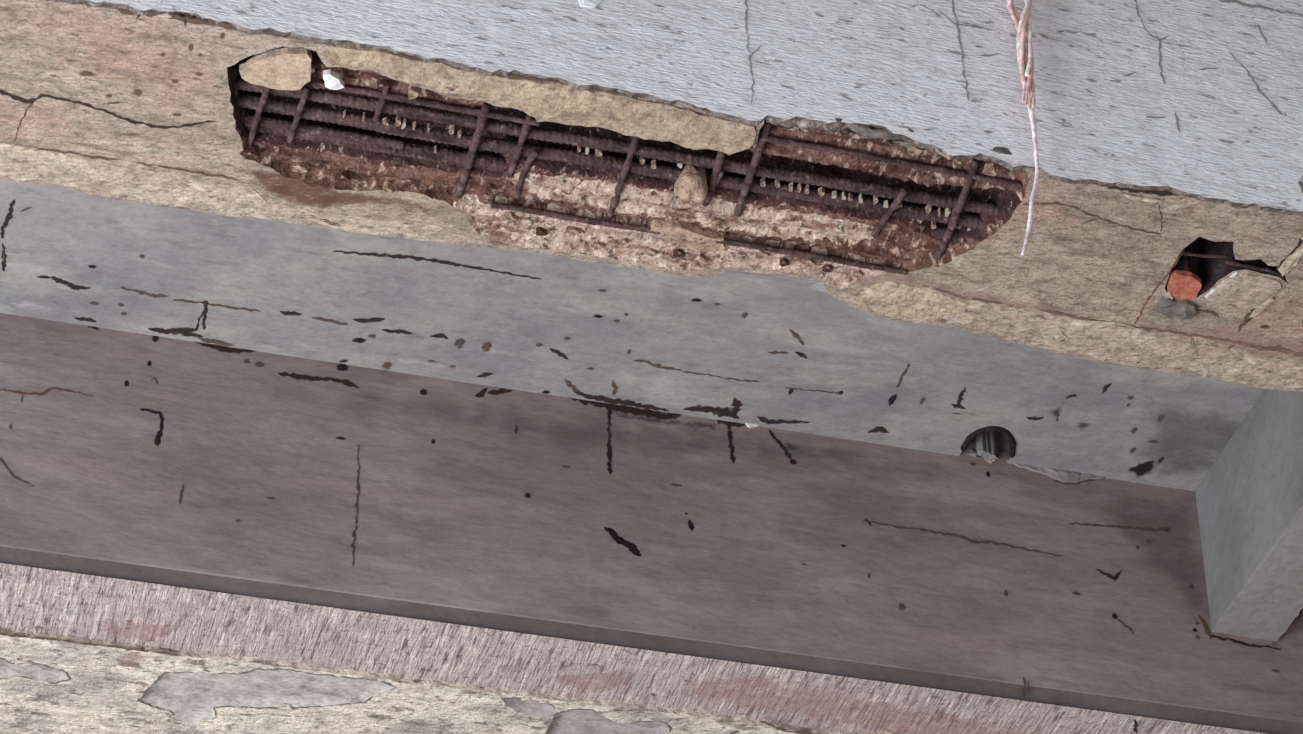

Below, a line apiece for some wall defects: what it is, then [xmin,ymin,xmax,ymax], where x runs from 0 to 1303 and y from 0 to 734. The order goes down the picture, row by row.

crack [1222,0,1303,17]
crack [939,0,979,101]
crack [1135,0,1180,132]
crack [0,90,236,180]
spalling [46,0,1303,322]
corrosion [255,172,390,226]
crack [0,200,31,271]
crack [38,276,90,290]
crack [121,287,448,339]
crack [549,348,568,360]
crack [634,329,843,395]
crack [351,445,360,565]